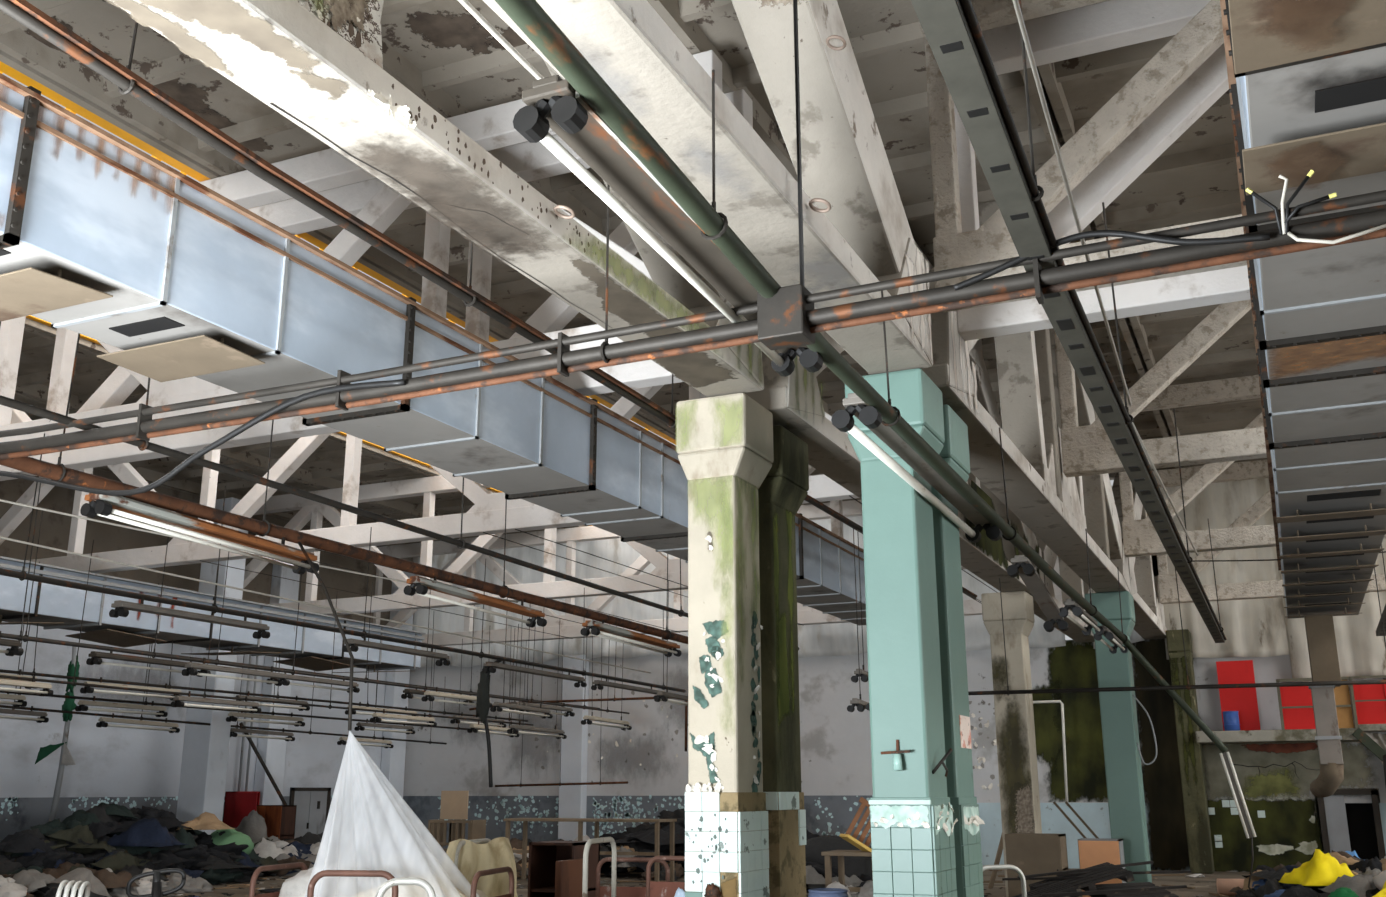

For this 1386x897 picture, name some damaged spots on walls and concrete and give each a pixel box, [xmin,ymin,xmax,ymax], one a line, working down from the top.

peeling [305,0,372,48]
leakage [572,259,683,337]
leakage [653,352,738,388]
rust [1273,334,1386,377]
peeling [693,620,729,709]
peeling [750,611,763,792]
peeling [591,691,724,836]
peeling [68,796,178,812]
peeling [438,794,559,835]
spalling [814,795,985,837]
spalling [1013,785,1035,833]
peeling [691,814,737,897]